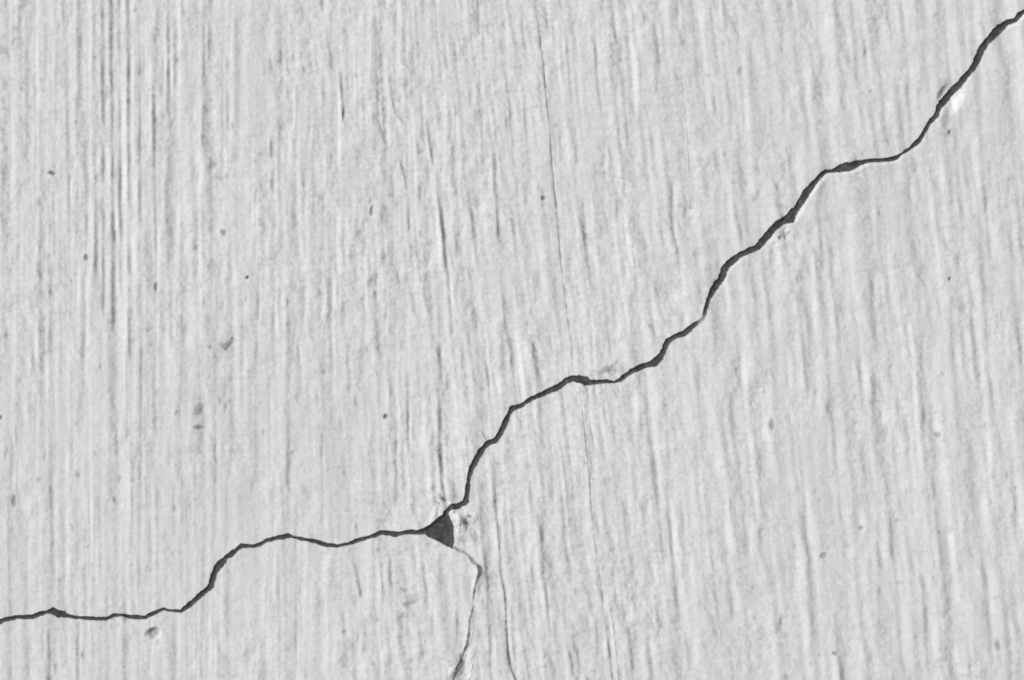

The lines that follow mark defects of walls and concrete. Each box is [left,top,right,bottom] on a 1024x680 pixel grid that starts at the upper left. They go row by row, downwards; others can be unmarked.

crack [0,528,422,625]
crack [442,8,1024,680]